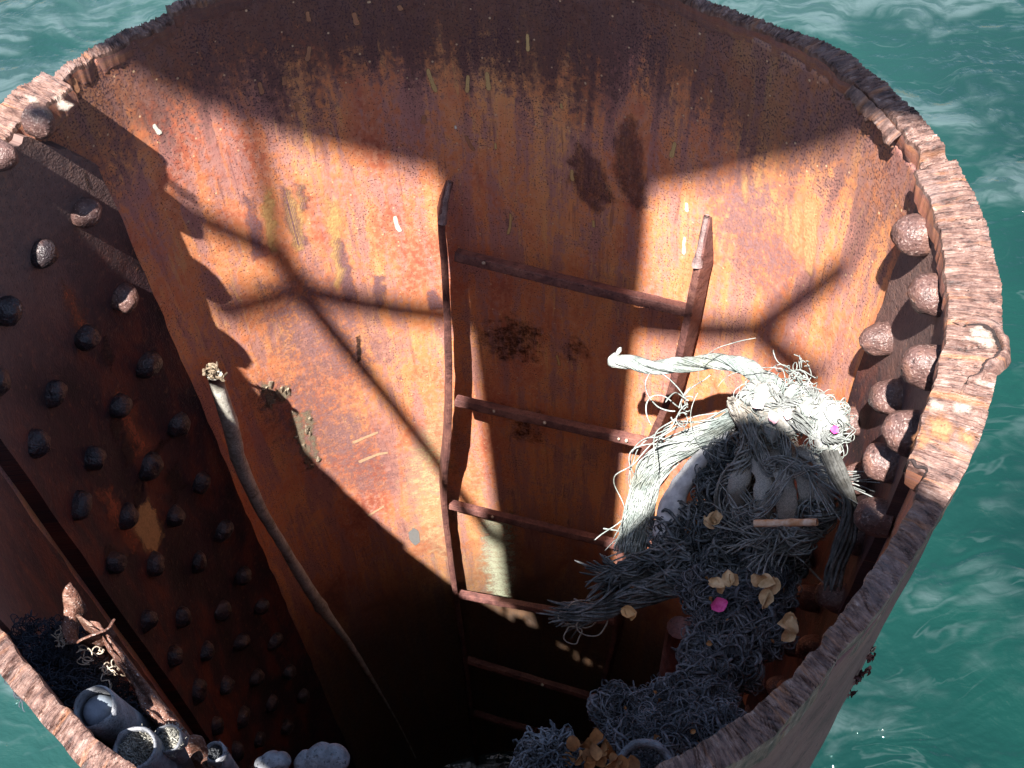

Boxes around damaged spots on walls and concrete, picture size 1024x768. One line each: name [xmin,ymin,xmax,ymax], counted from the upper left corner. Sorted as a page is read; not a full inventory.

corrosion [844,85,901,148]
corrosion [568,120,646,211]
corrosion [243,184,308,260]
corrosion [710,171,818,297]
corrosion [427,290,443,310]
corrosion [260,200,393,492]
corrosion [485,320,538,362]
corrosion [97,489,161,551]